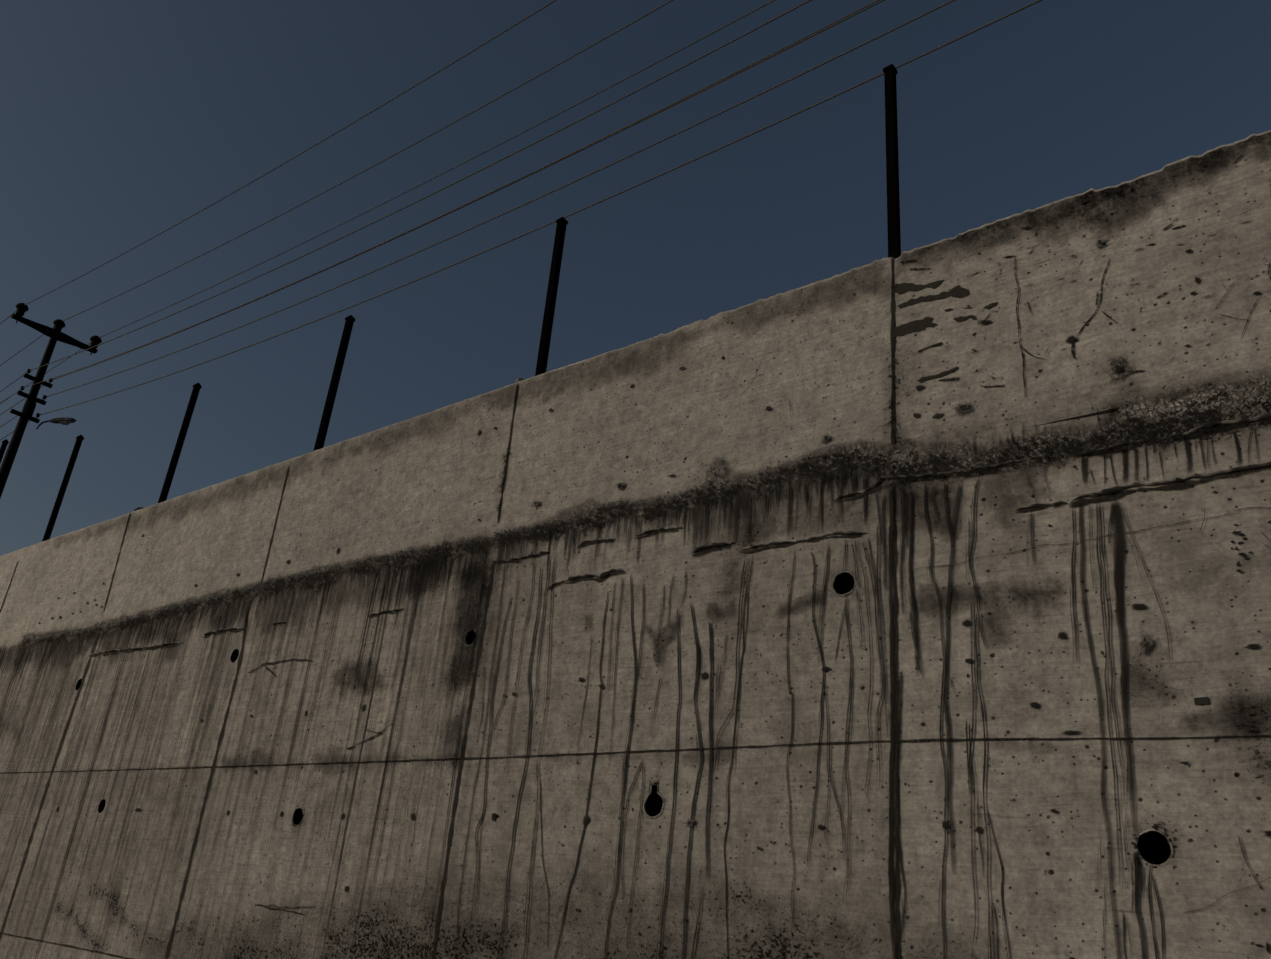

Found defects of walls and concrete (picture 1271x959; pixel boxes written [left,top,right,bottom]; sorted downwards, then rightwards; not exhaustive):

crack [1014,258,1117,390]
leakage [0,466,1011,959]
leakage [1011,420,1271,959]